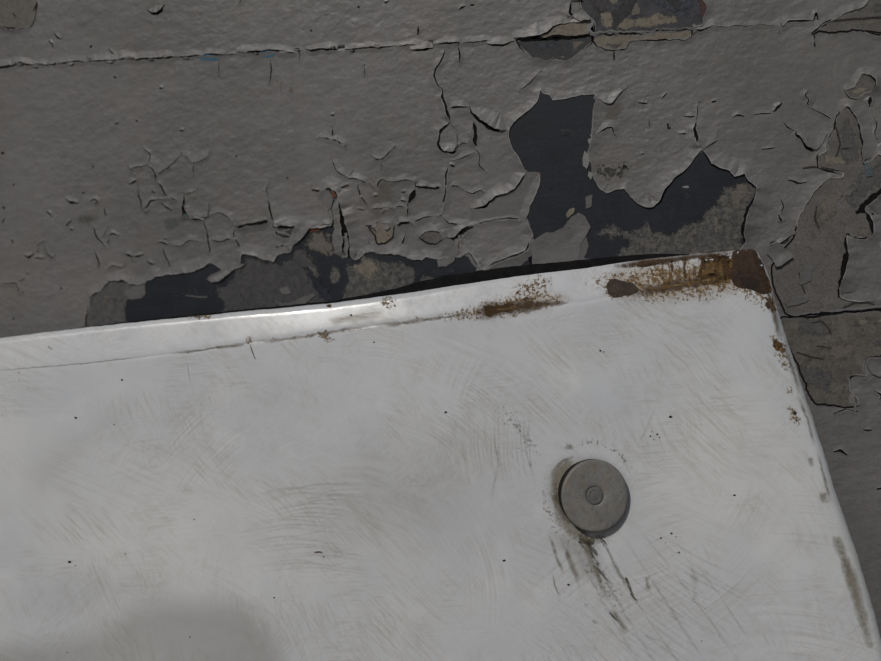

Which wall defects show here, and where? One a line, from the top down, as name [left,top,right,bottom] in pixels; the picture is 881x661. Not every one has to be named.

peeling [0,0,40,34]
peeling [511,0,728,69]
peeling [469,104,510,136]
peeling [582,138,594,179]
peeling [81,176,492,327]
peeling [532,195,592,264]
peeling [766,66,881,417]
corrosion [450,276,560,320]
corrosion [593,249,796,394]